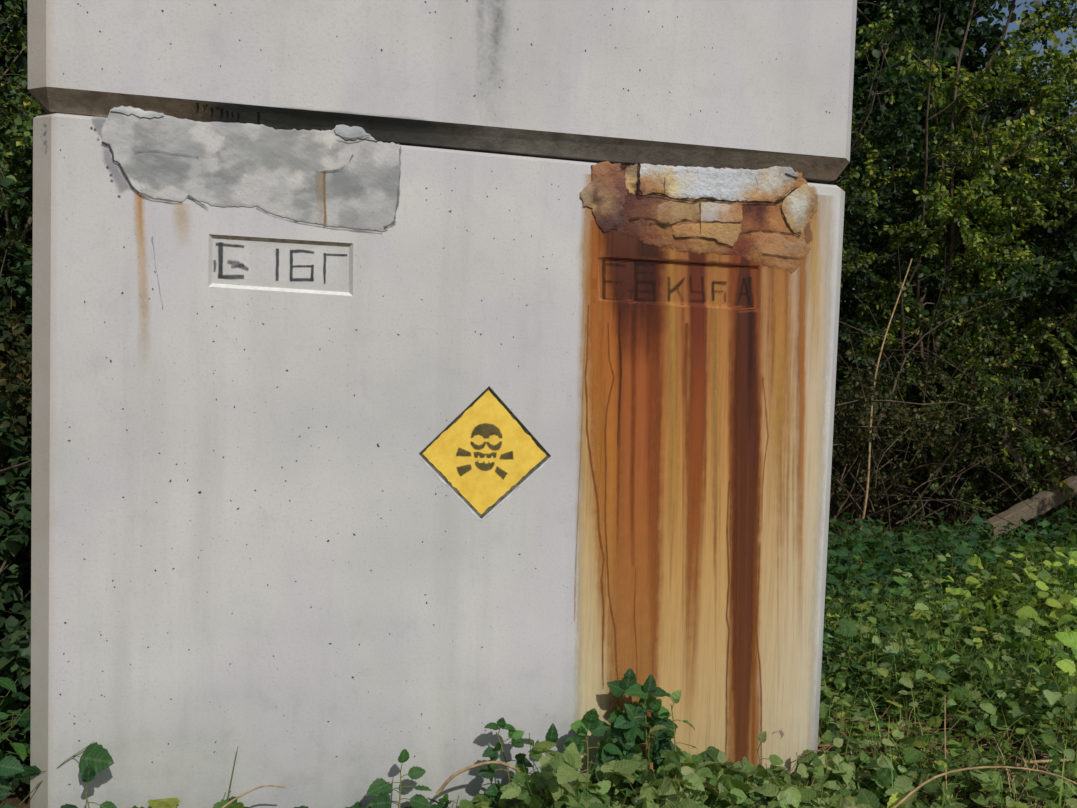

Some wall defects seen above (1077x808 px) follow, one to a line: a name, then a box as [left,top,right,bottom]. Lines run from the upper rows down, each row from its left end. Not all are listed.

rust [136,192,145,308]
spalling [580,161,818,274]
rust [575,194,831,774]